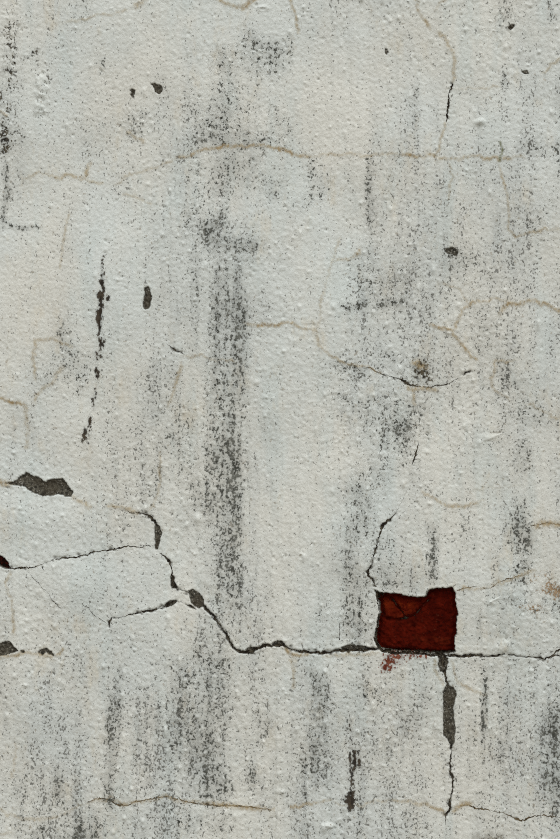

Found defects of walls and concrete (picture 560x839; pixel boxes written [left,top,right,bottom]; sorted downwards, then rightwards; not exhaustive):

spalling [143,287,152,309]
leakage [164,29,293,640]
spalling [9,473,73,496]
crack [0,511,377,655]
crack [366,497,404,587]
spalling [0,641,25,656]
spalling [373,587,458,672]
leakage [132,645,234,839]
crack [441,649,560,824]
crack [88,796,270,814]